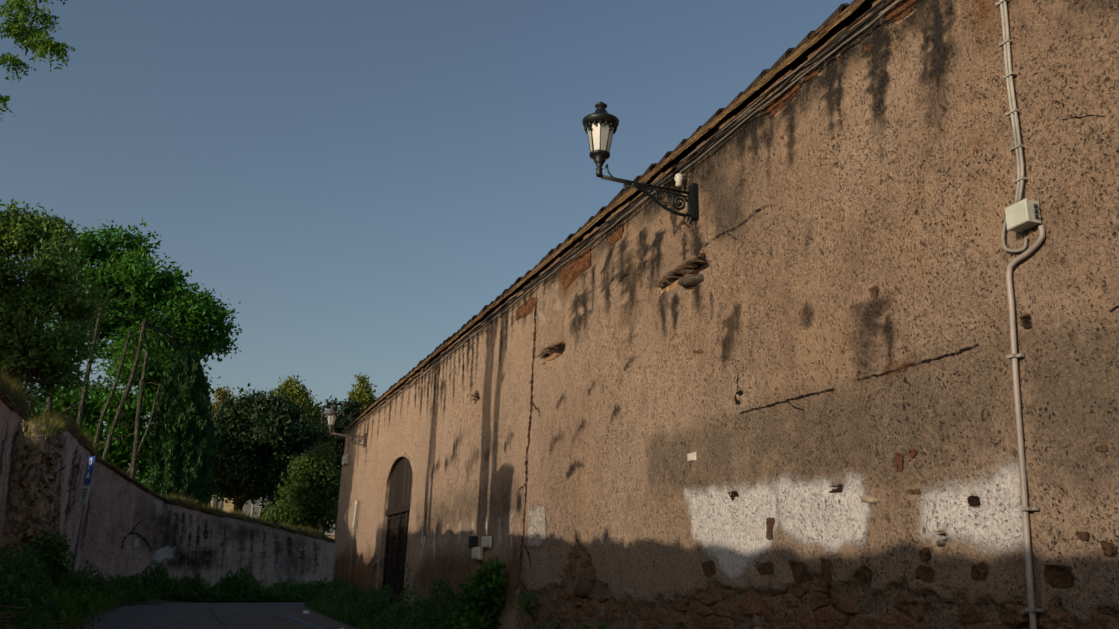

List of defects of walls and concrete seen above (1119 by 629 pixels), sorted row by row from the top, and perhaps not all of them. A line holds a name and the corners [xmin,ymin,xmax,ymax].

damp [348,0,954,464]
crack [517,296,540,575]
crack [737,373,834,414]
crack [859,344,978,380]
damp [140,500,318,572]
spalling [508,463,1119,629]